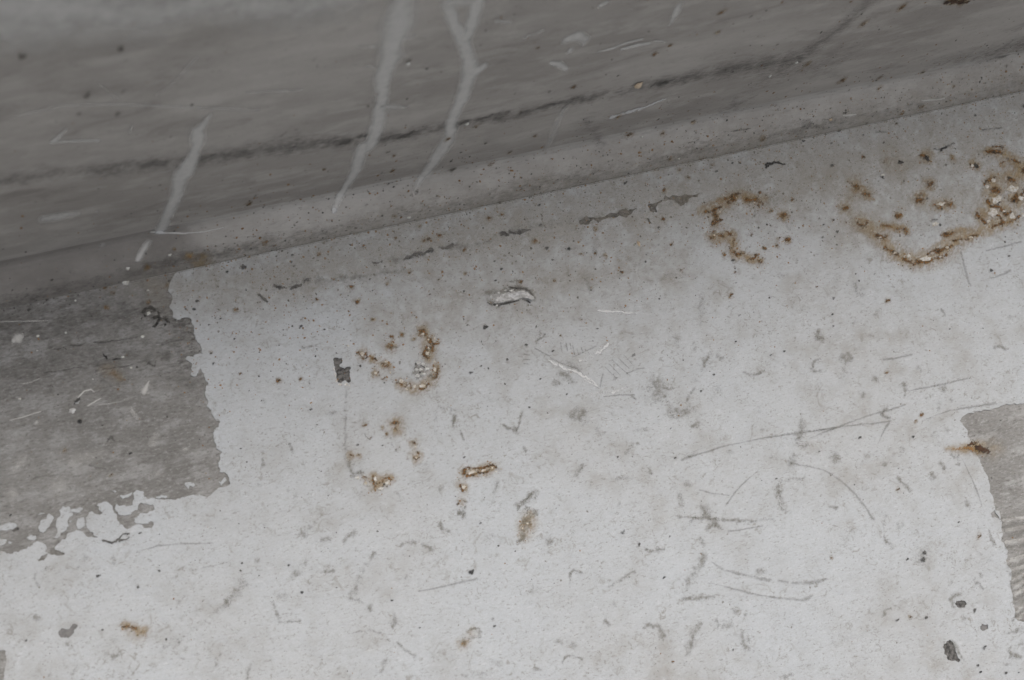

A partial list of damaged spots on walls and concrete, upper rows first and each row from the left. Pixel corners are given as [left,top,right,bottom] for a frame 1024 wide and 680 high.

leakage [322,0,419,209]
leakage [415,0,502,189]
leakage [156,115,247,231]
rust [702,189,791,263]
rust [833,145,1024,266]
rust [347,327,443,391]
peeling [0,274,230,561]
rust [349,454,394,495]
rust [455,461,502,510]
rust [953,439,991,457]
peeling [960,403,1024,622]